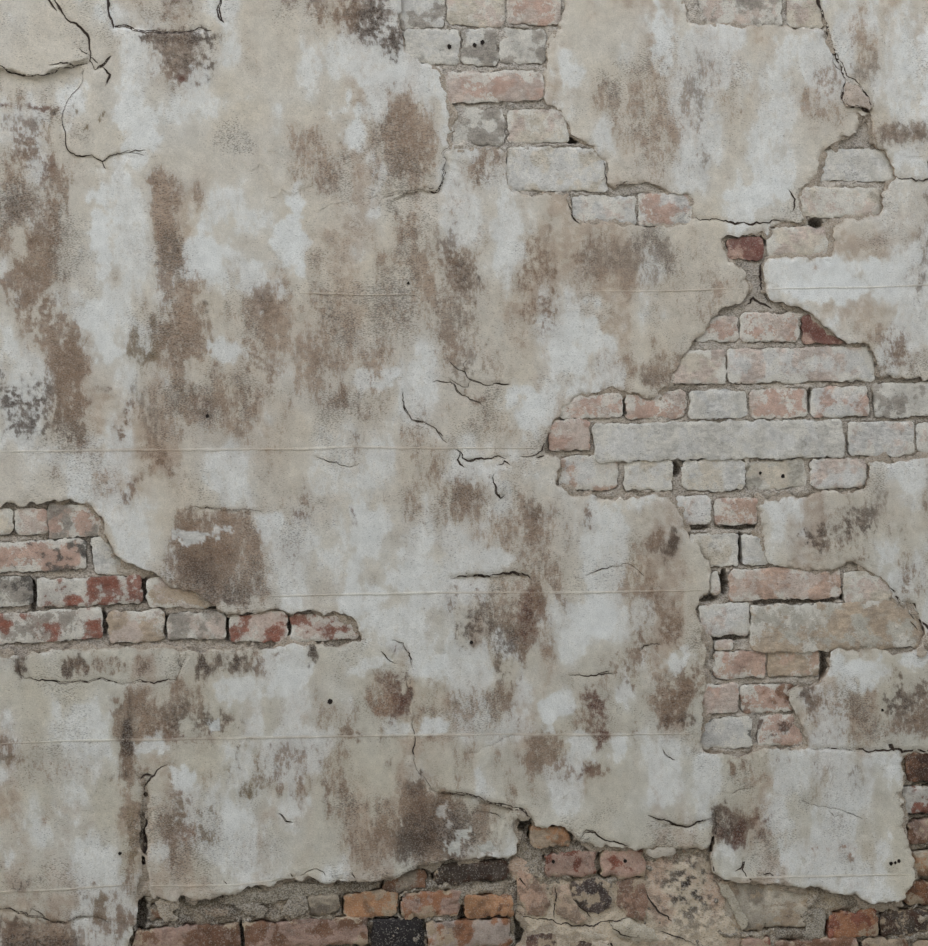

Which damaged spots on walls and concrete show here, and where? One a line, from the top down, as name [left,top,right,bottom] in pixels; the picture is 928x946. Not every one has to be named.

crack [0,0,144,169]
crack [107,0,224,34]
spalling [398,0,705,228]
spalling [0,499,365,658]
leakage [0,0,686,946]
crack [402,394,547,499]
leakage [603,497,707,757]
spalling [544,0,928,758]
leakage [772,458,928,622]
crack [412,725,530,817]
spalling [128,751,928,946]
leakage [707,648,928,821]